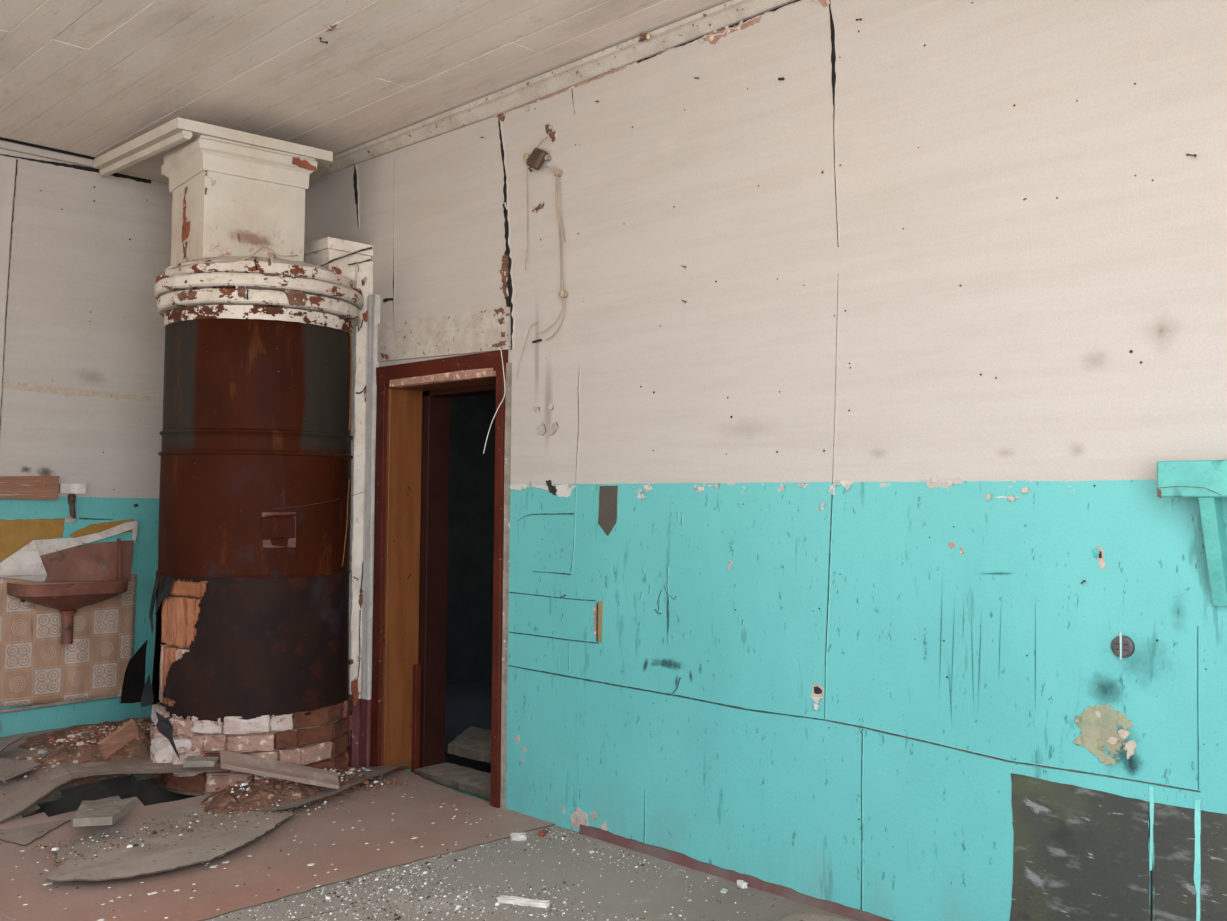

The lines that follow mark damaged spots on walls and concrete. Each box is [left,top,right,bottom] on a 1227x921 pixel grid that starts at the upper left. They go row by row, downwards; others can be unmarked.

crack [498,120,515,350]
peeling [154,275,197,302]
peeling [236,256,308,306]
flaking render [351,277,368,322]
peeling [478,270,507,349]
peeling [817,480,853,511]
crack [508,0,1201,921]
peeling [921,475,963,489]
peeling [985,487,1031,502]
peeling [1073,704,1137,766]